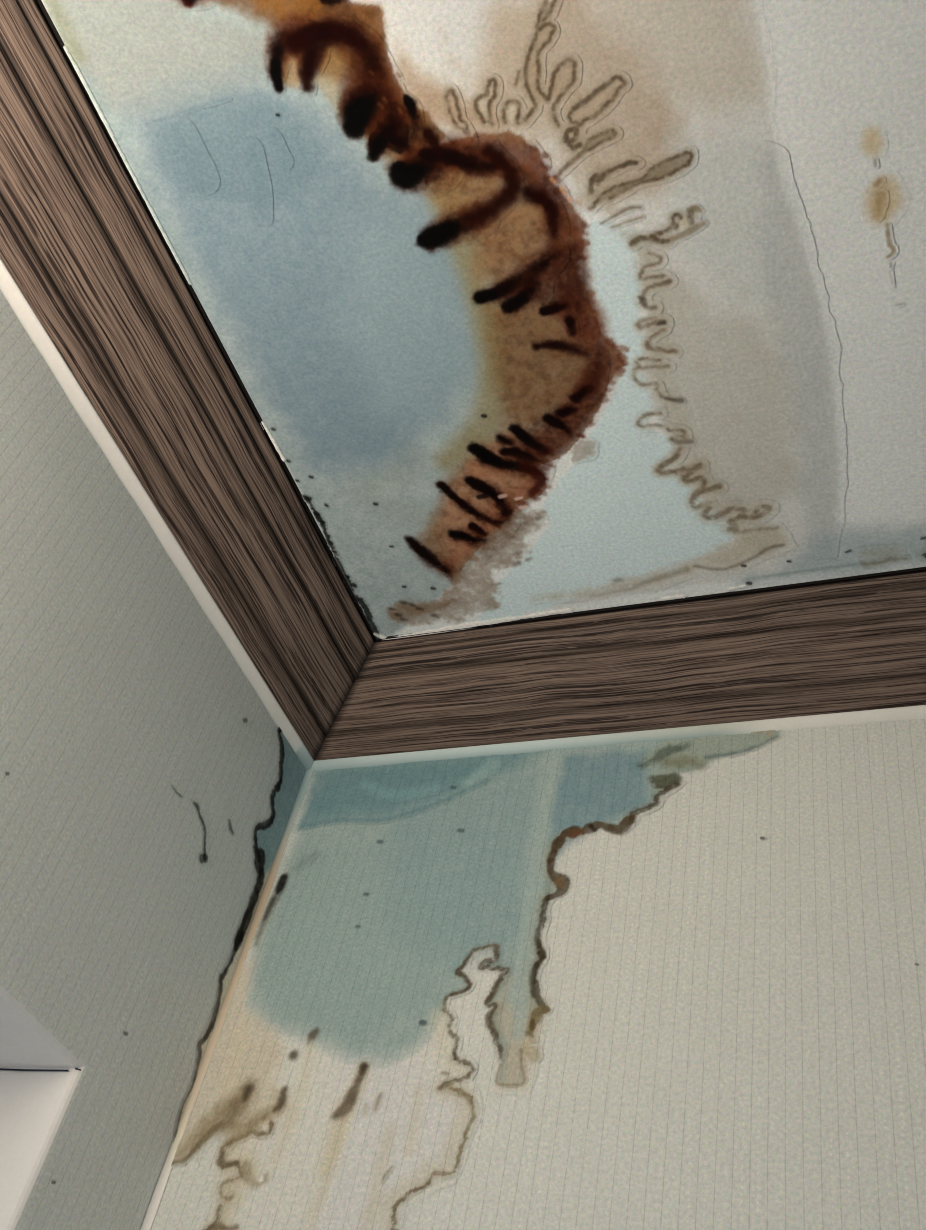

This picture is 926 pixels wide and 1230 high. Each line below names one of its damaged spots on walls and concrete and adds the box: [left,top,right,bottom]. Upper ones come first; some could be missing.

water stain [41,0,552,638]
water stain [374,0,926,609]
crack [171,784,235,865]
water stain [171,726,783,1230]